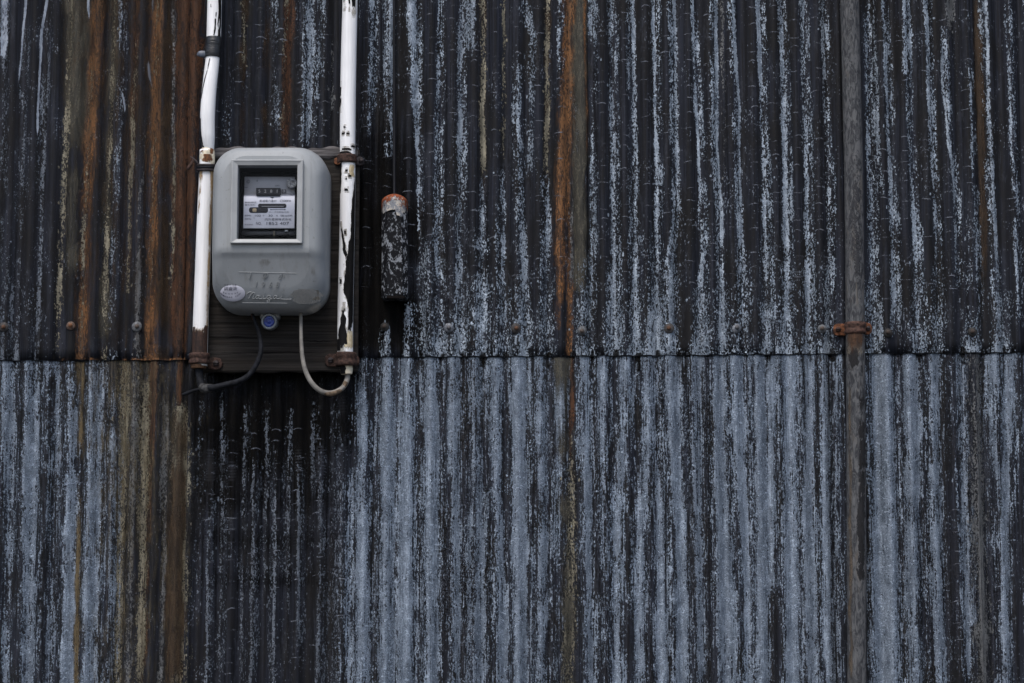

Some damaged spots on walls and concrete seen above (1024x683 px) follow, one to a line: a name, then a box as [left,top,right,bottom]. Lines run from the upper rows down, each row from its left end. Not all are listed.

rust [74,0,106,447]
rust [123,0,214,683]
rust [382,194,408,209]
rust [553,0,588,466]
peeling [238,0,1024,683]
rust [73,518,81,683]